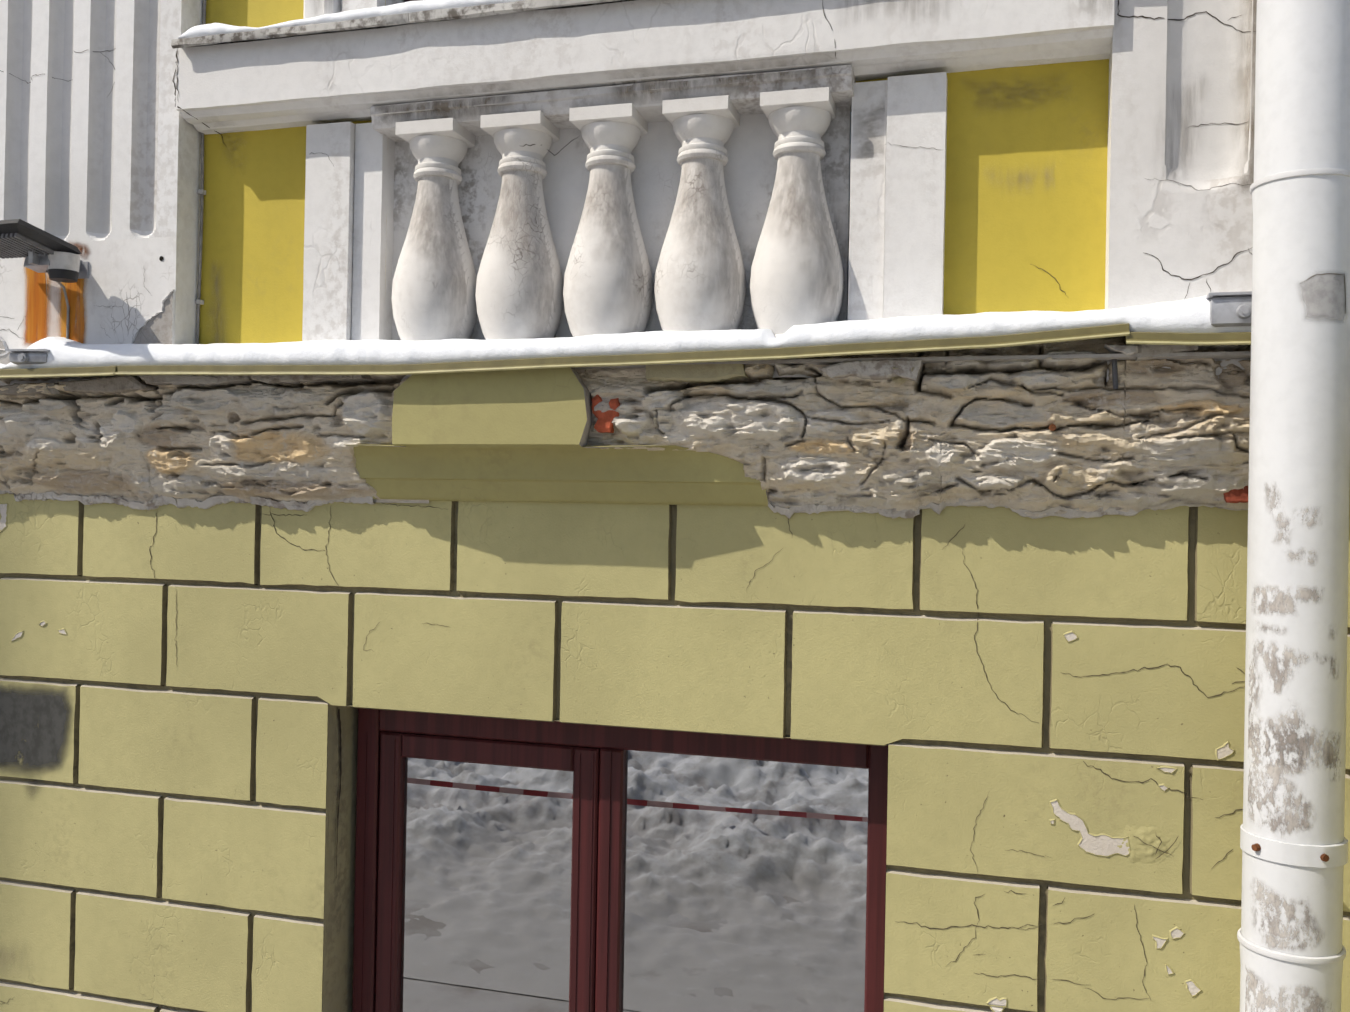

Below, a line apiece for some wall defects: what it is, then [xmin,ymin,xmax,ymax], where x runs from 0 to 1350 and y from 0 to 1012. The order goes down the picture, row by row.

crack [1117,0,1256,33]
crack [1145,247,1253,300]
spalling [132,289,176,344]
flaking render [0,490,374,531]
crack [945,524,1032,722]
crack [1063,664,1245,698]
peeling [1215,587,1337,833]
crack [1083,761,1243,818]
peeling [1049,799,1131,858]
crack [895,795,1151,1000]
peeling [1256,883,1319,949]
peeling [1245,971,1324,1012]